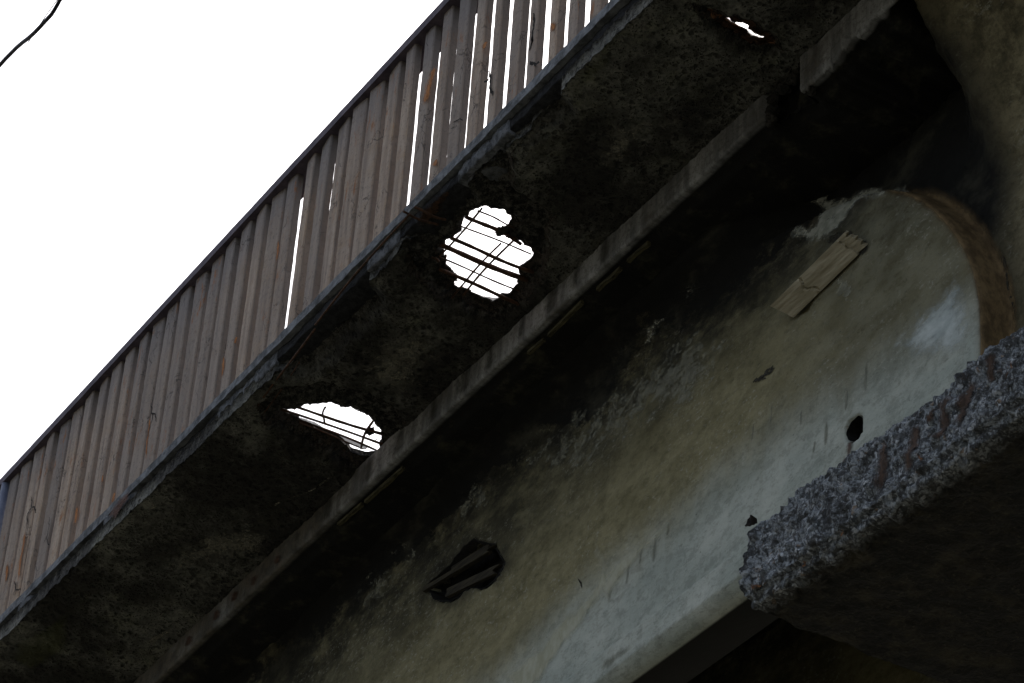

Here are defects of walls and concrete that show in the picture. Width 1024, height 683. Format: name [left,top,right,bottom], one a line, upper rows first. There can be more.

spalling [256,213,411,451]
spalling [438,208,534,306]
water stain [794,190,885,240]
rust [892,190,1016,381]
rust [903,384,975,470]
spalling [422,538,505,602]